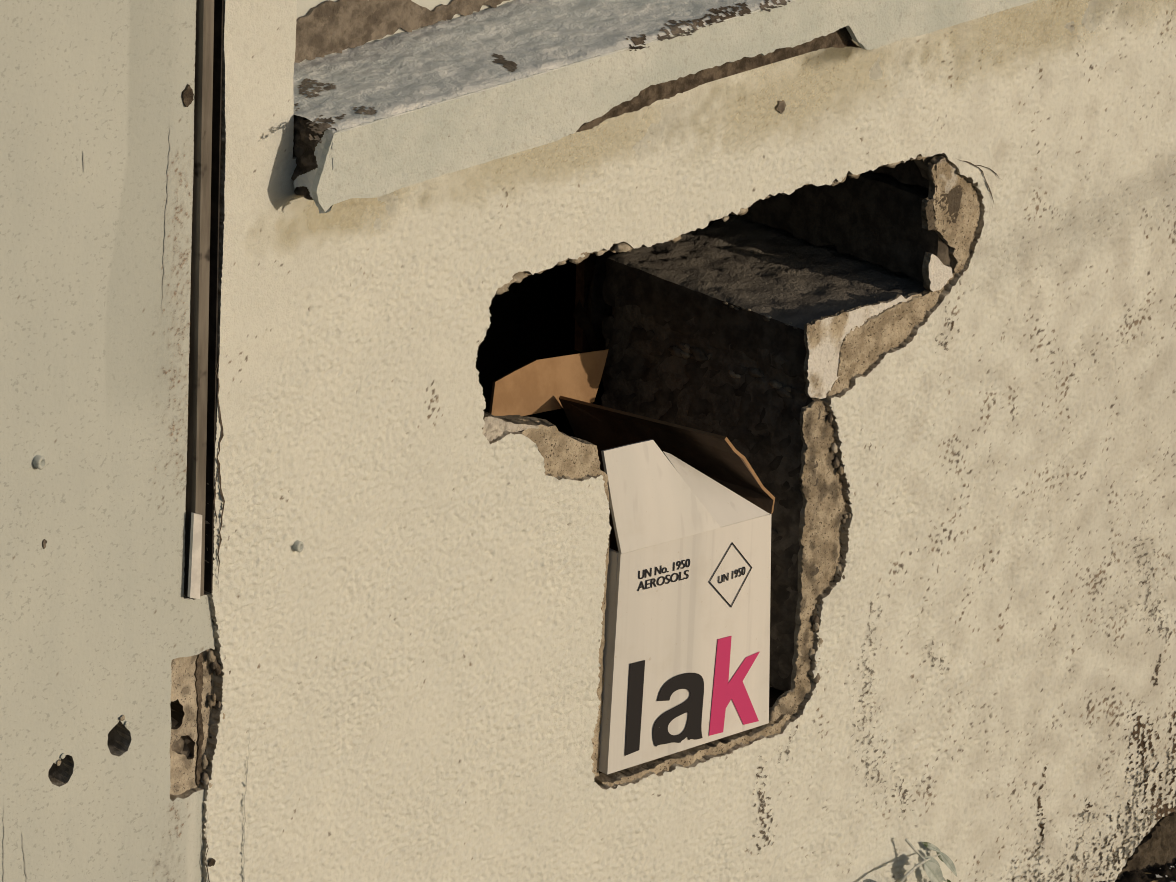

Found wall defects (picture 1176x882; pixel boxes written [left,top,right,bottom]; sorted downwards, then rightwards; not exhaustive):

peeling [294,0,510,63]
peeling [626,0,791,51]
spalling [291,78,377,214]
spalling [570,83,702,135]
spalling [482,411,600,479]
spalling [594,154,981,787]
water stain [1134,545,1176,686]
spalling [170,648,231,795]
water stain [852,601,915,812]
water stain [1029,767,1047,862]
water stain [1106,702,1176,871]
peeling [1117,813,1176,880]